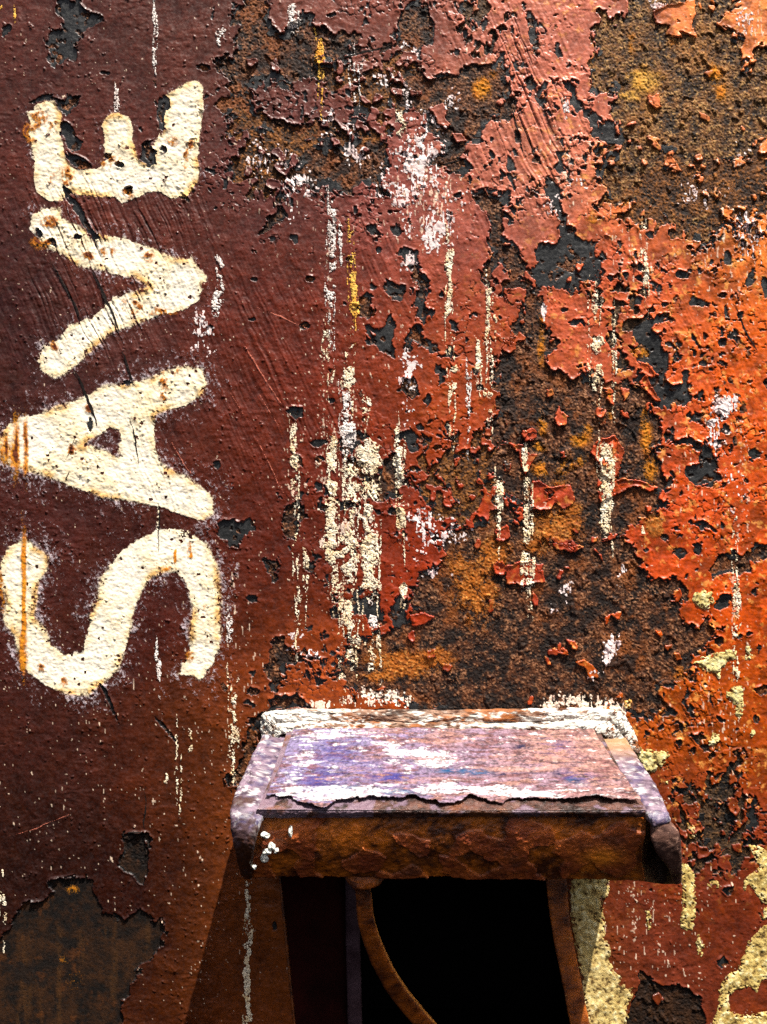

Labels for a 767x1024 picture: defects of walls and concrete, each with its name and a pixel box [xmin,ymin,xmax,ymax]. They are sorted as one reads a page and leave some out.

peeling [196,0,547,242]
corrosion [619,64,659,100]
peeling [562,0,767,254]
corrosion [709,65,726,98]
peeling [223,149,731,786]
corrosion [640,410,657,481]
corrosion [524,502,582,557]
corrosion [444,534,511,624]
corrosion [357,647,456,682]
peeling [671,748,764,896]
peeling [0,874,168,1024]
peeling [627,971,705,1024]